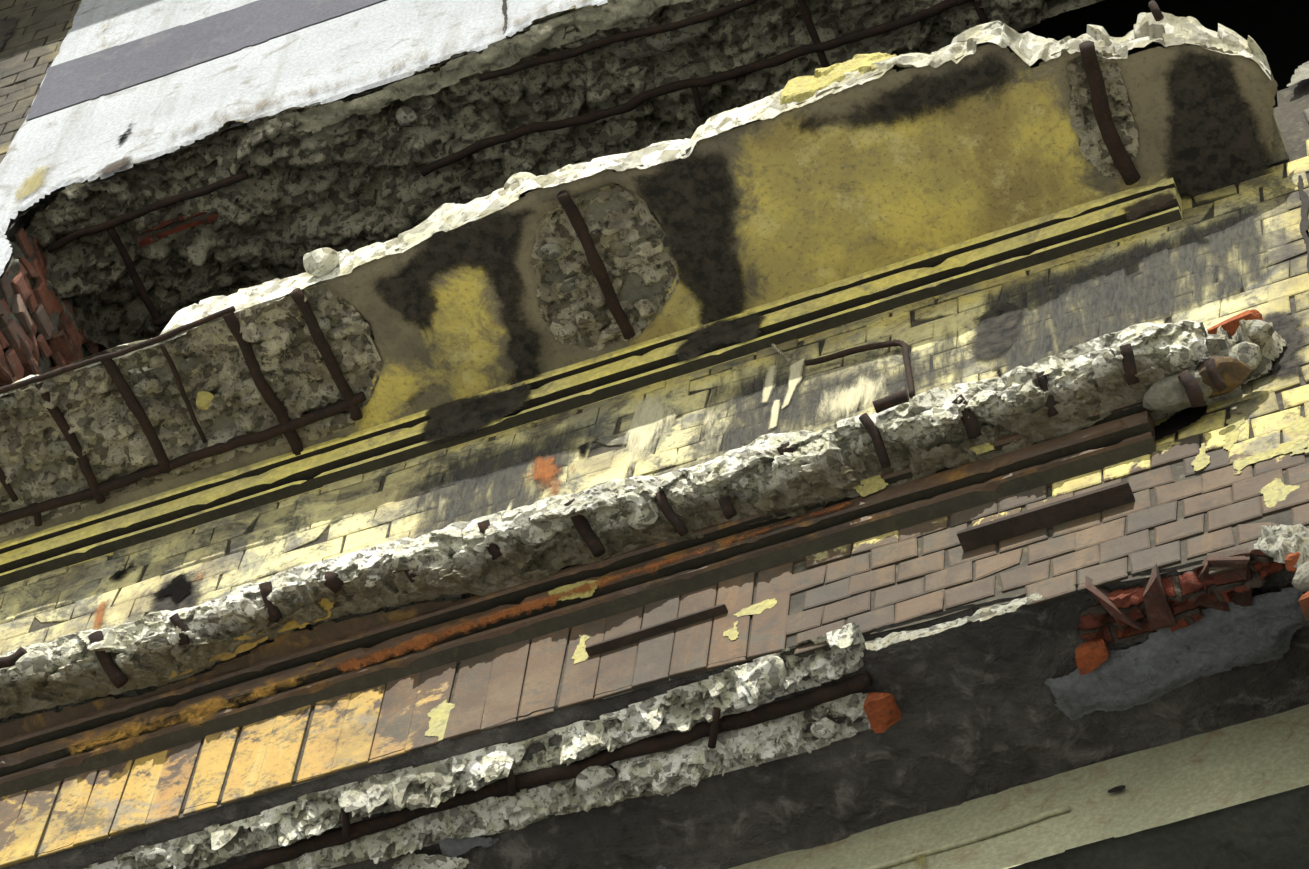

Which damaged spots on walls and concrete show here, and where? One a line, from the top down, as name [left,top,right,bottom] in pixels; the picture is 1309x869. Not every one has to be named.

corrosion [71,696,224,752]
corrosion [251,676,298,698]
damp [374,209,541,442]
damp [417,426,596,535]
corrosion [529,457,574,495]
spalling [84,593,1045,869]
corrosion [339,502,851,672]
spalling [0,0,1279,537]
damp [626,394,675,468]
spalling [0,309,1309,720]
damp [634,153,765,362]
damp [699,208,1268,456]